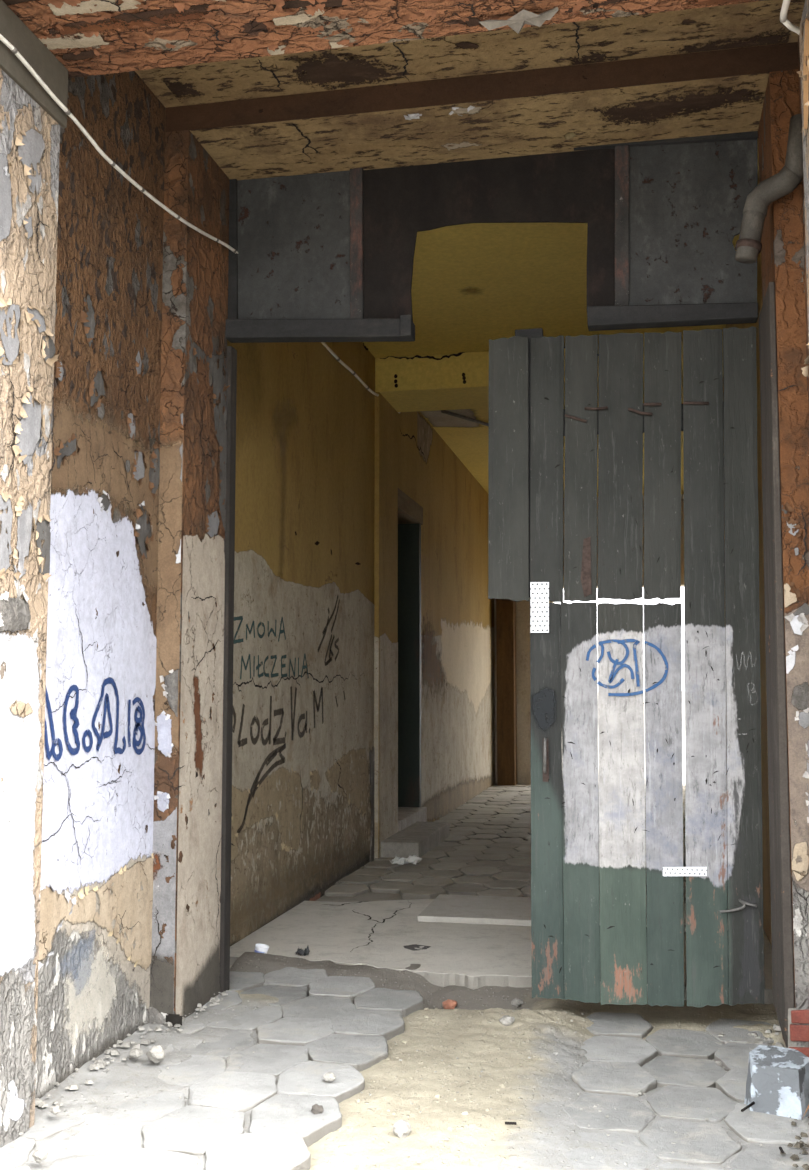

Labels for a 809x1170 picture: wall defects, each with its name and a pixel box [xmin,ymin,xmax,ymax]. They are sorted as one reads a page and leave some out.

peeling [2,0,230,63]
crack [572,22,580,60]
peeling [0,126,46,241]
peeling [0,296,65,388]
peeling [12,387,80,469]
spalling [126,408,160,560]
peeling [205,358,228,539]
spalling [0,491,51,633]
crack [52,604,98,713]
peeling [784,582,809,674]
crack [42,744,185,862]
spalling [791,682,809,823]